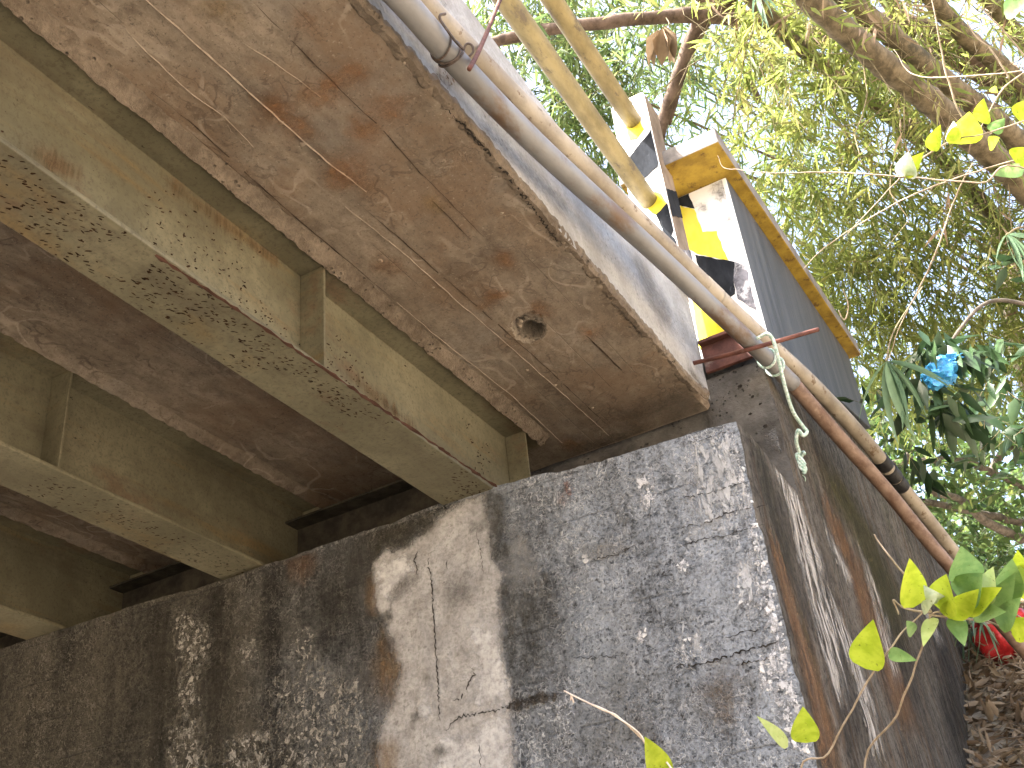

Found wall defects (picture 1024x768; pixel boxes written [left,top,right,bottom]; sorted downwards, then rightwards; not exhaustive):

spalling [0,0,550,446]
crack [440,106,564,247]
spalling [350,0,710,400]
crack [413,550,561,730]
crack [670,629,783,668]
leakage [767,474,882,757]
leakage [859,549,910,702]